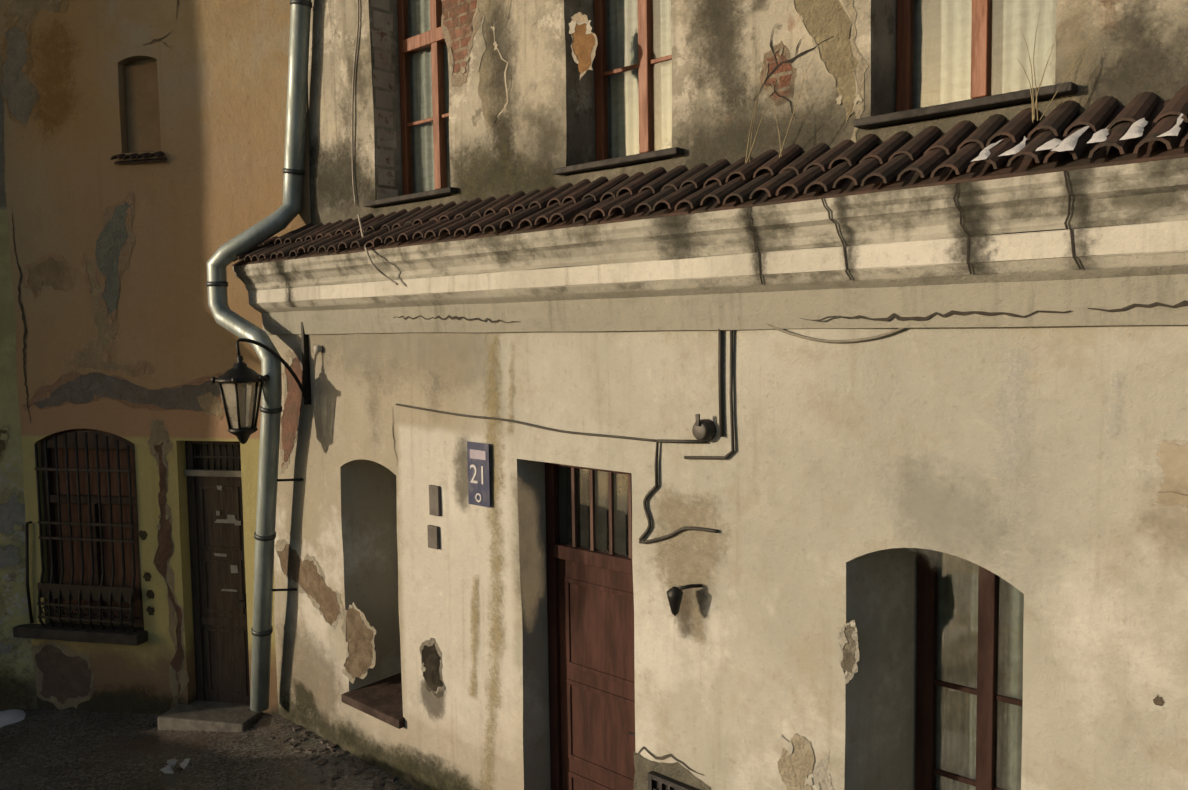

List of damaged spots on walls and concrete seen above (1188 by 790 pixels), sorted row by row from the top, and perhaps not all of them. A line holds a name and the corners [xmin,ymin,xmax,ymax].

flaking render [441,0,511,140]
crack [821,198,852,280]
crack [953,183,972,274]
crack [1063,170,1082,269]
crack [12,213,31,423]
crack [801,300,1188,321]
water stain [455,443,468,506]
flaking render [139,419,189,708]
flaking render [275,539,376,684]
water stain [470,339,512,790]
spalling [419,638,446,696]
flaking render [778,733,834,790]